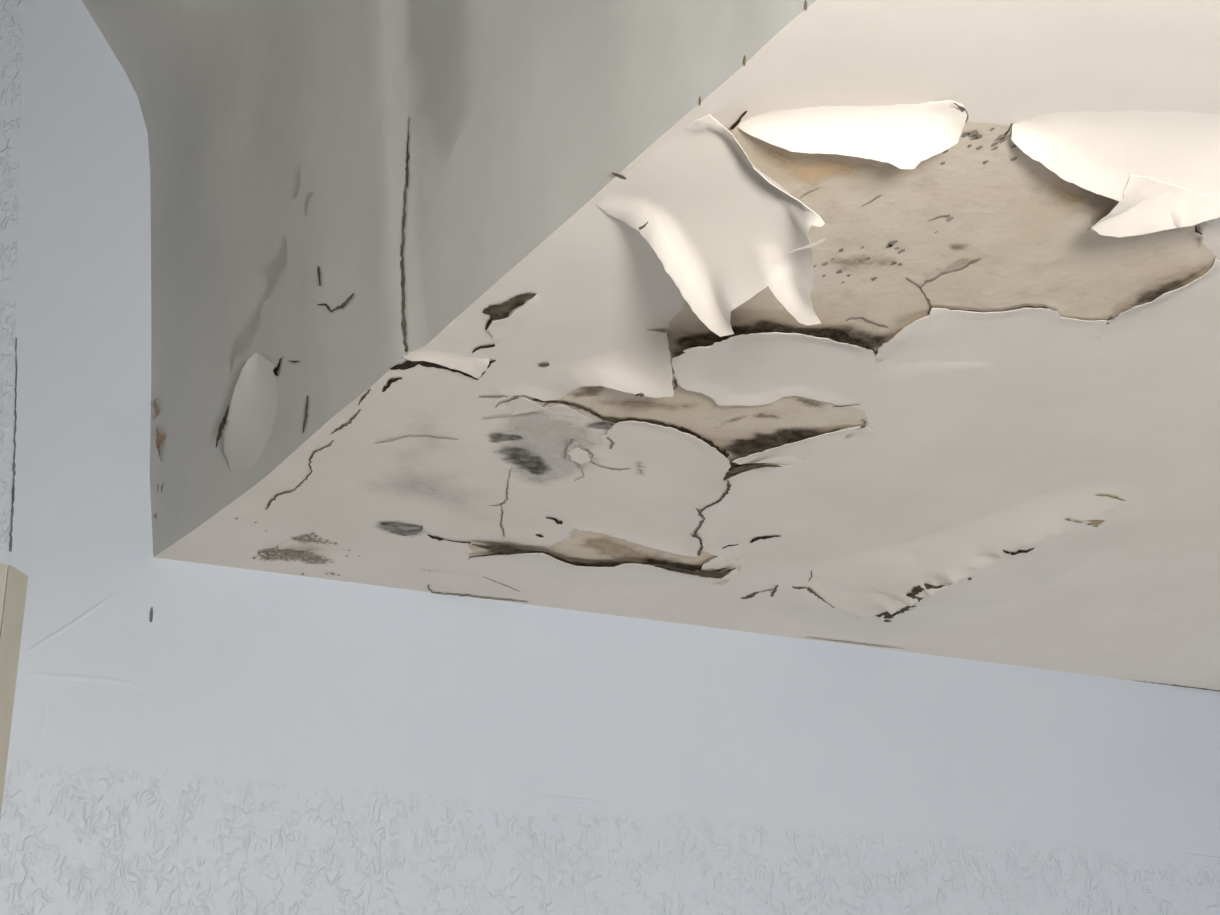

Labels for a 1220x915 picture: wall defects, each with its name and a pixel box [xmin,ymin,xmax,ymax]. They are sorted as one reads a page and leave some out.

crack [266,117,550,510]
peeling [493,95,1220,481]
mould [491,434,546,474]
mould [483,397,615,449]
mould [564,439,642,481]
peeling [468,529,742,592]